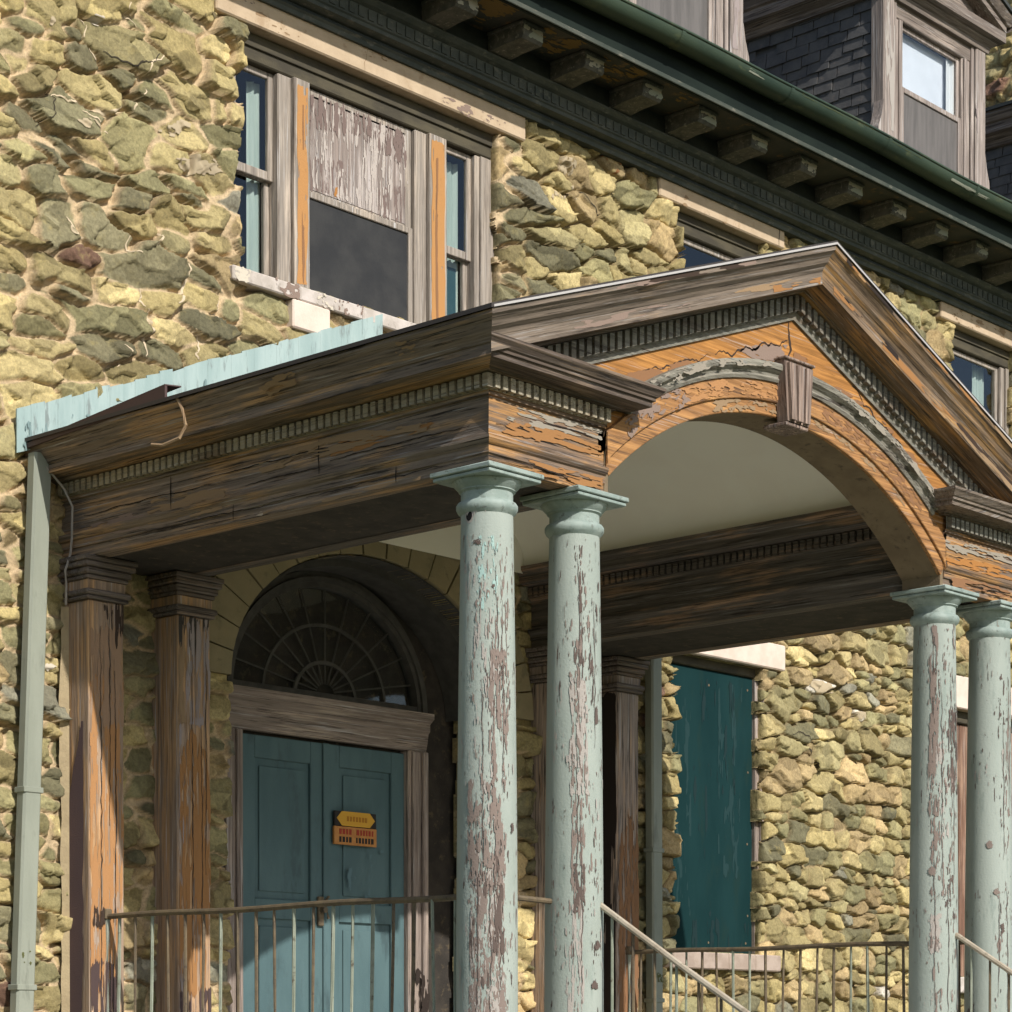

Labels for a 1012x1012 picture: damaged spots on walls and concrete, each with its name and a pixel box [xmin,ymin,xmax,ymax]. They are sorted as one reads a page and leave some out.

peeling [297,84,408,285]
peeling [90,622,124,992]
peeling [179,618,211,998]
peeling [459,510,518,1012]
peeling [551,537,603,1012]
peeling [618,813,639,1012]
peeling [913,623,974,1012]
peeling [970,643,1012,857]